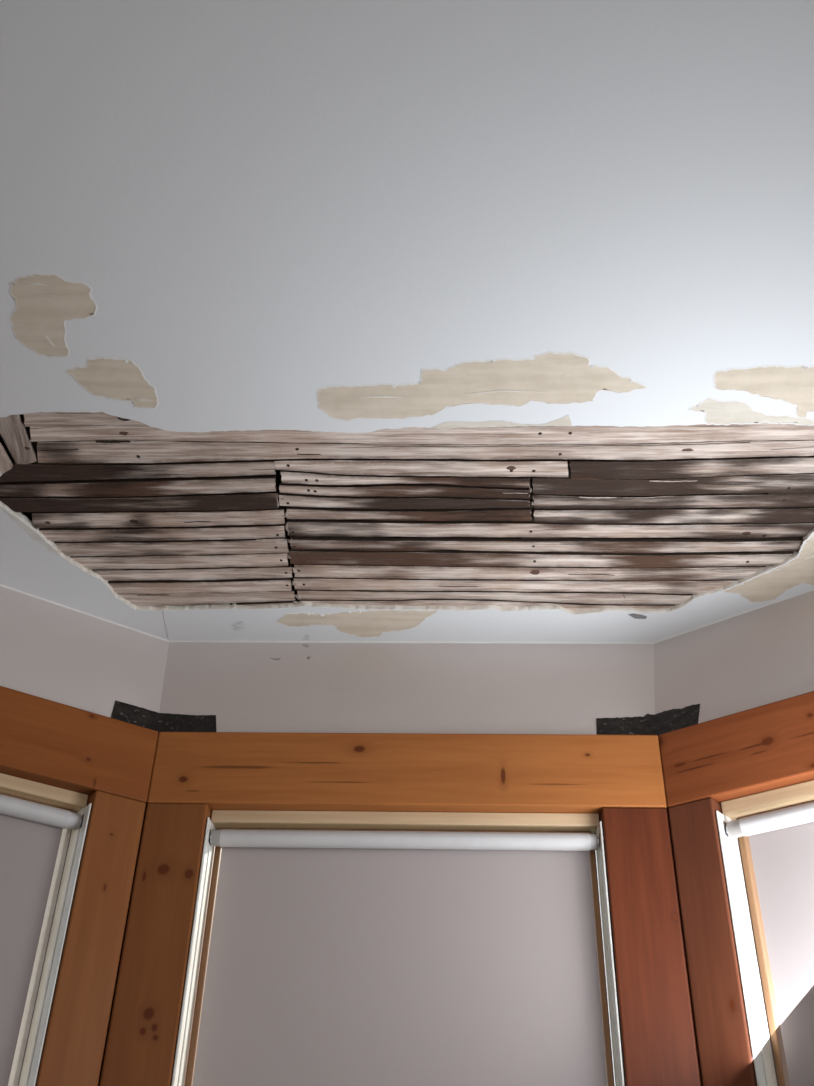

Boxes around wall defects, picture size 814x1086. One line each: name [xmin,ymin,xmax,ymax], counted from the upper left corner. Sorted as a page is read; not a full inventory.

spalling [0,272,814,638]